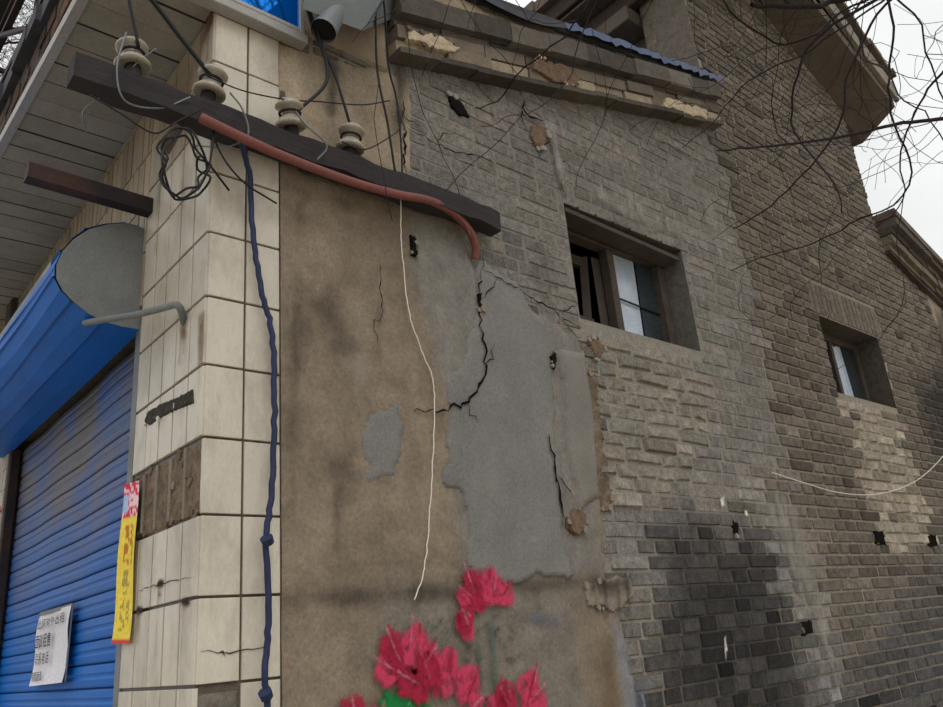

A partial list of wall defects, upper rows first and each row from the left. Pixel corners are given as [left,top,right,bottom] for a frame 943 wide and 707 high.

spalling [404,25,460,56]
spalling [531,54,581,87]
hole [445,90,470,118]
crack [414,260,585,423]
spalling [549,349,558,370]
spalling [143,389,194,426]
peeling [587,334,616,512]
peeling [134,442,202,541]
spalling [566,507,591,536]
peeling [197,690,237,707]